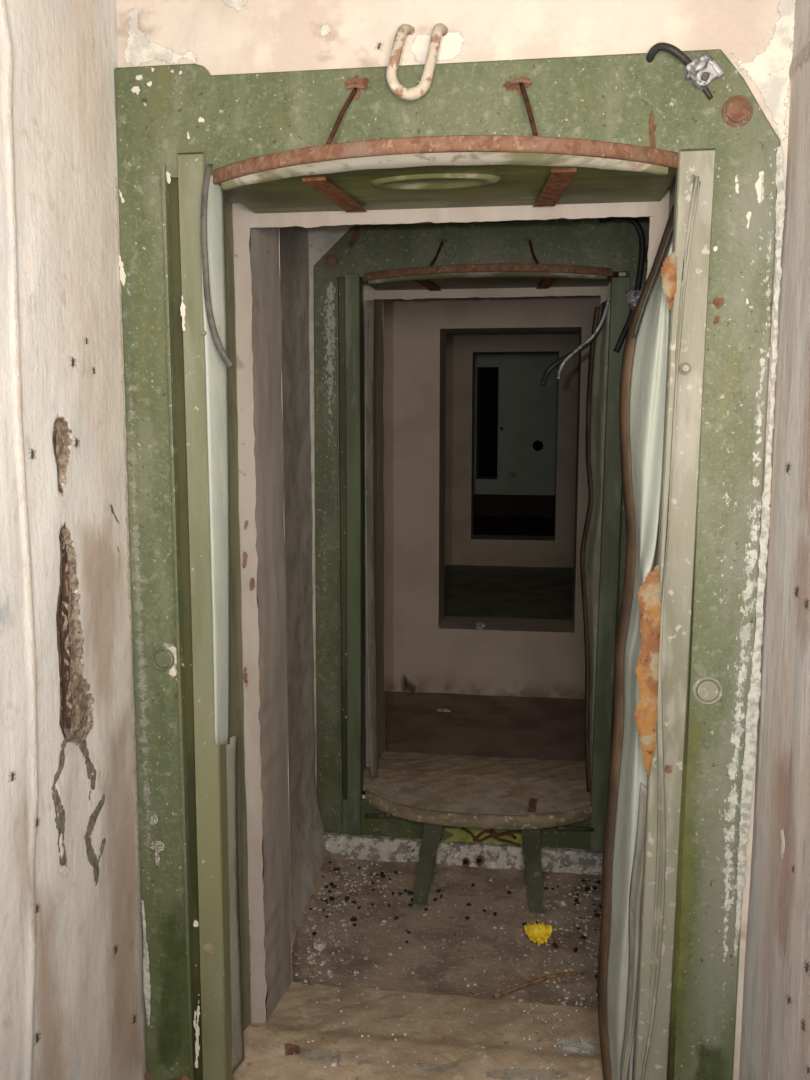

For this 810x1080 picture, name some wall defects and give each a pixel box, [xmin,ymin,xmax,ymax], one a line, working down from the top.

peeling [124,7,197,106]
peeling [730,0,795,140]
peeling [746,171,764,229]
crack [51,523,96,877]